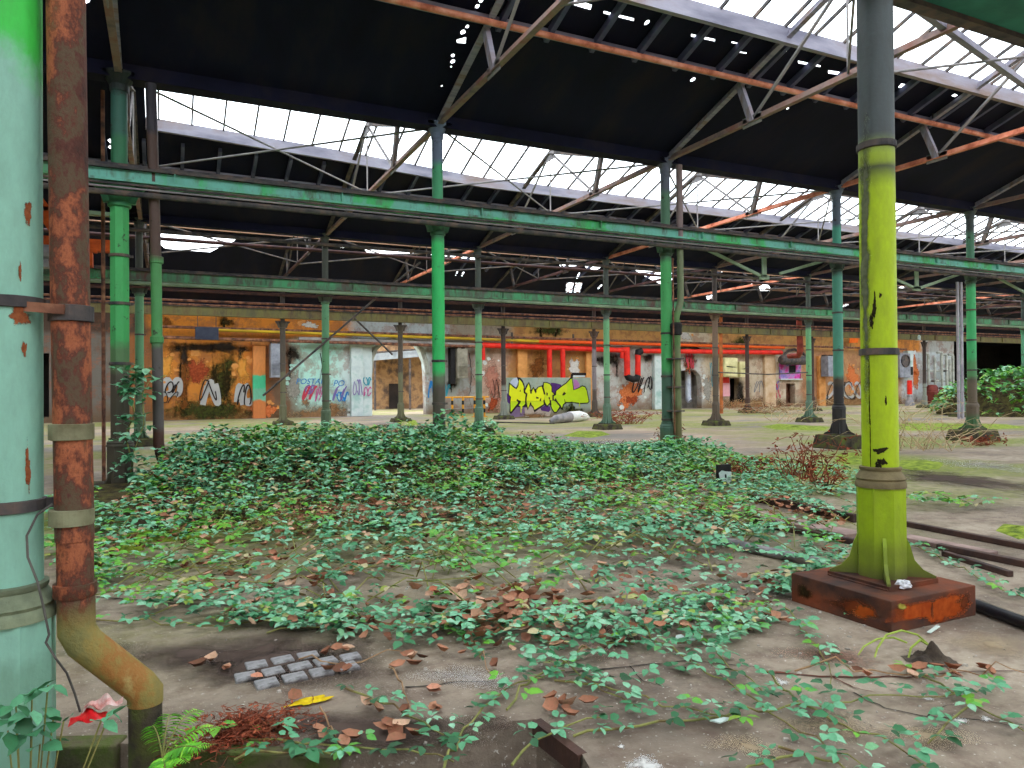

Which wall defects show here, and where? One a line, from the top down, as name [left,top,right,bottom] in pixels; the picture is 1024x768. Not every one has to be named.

water stain [166,342,252,420]
flaking render [845,363,888,468]
rust [834,599,876,619]
rust [895,594,970,623]